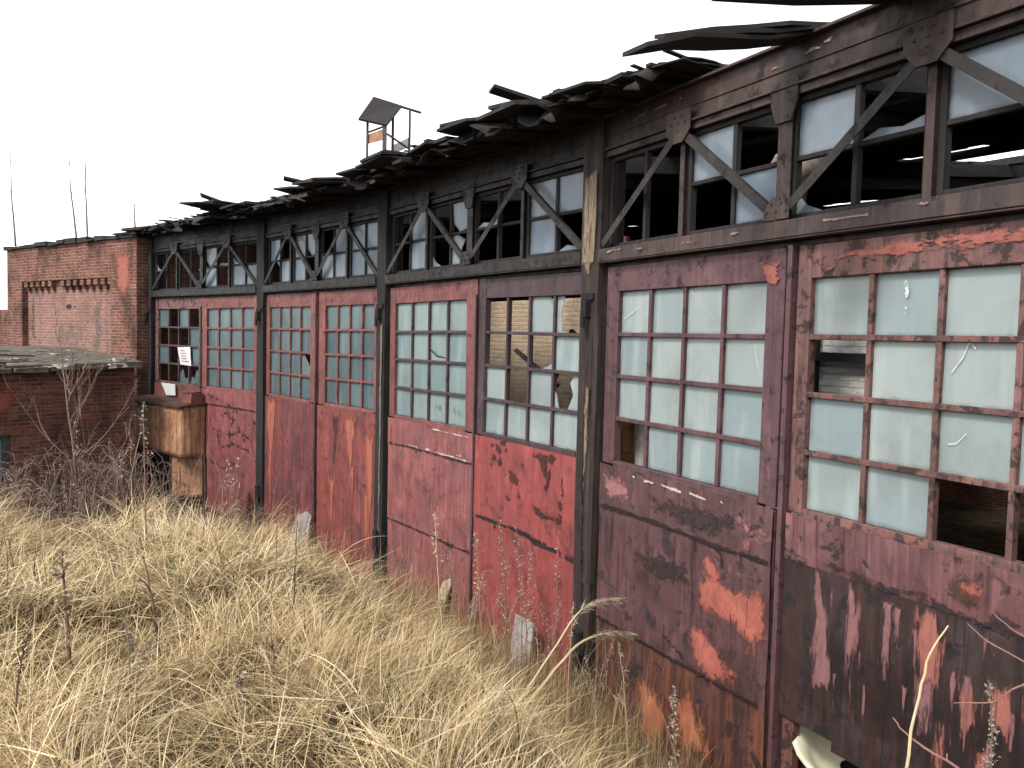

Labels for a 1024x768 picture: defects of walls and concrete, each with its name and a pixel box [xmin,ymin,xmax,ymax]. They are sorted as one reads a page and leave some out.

peeling [760,261,780,284]
peeling [826,227,1024,270]
peeling [634,542,767,653]
peeling [689,626,734,688]
peeling [810,570,865,714]
peeling [877,601,1023,768]